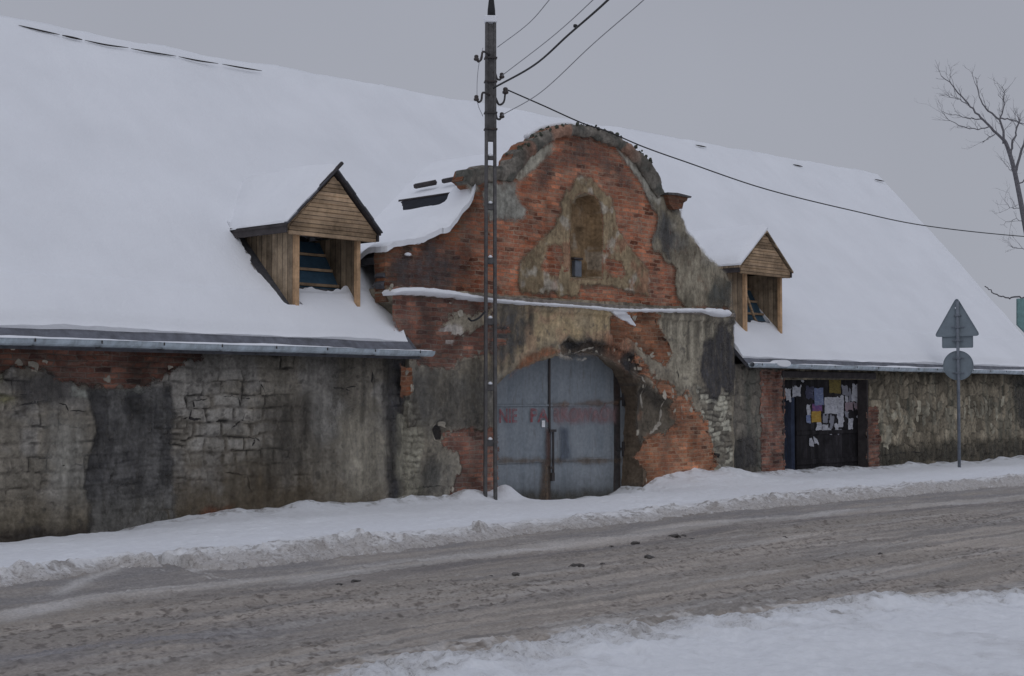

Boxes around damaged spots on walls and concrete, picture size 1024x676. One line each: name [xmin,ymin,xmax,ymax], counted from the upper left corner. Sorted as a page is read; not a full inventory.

flaking render [0,349,204,390]
flaking render [389,284,510,398]
flaking render [559,312,720,488]
water stain [701,320,736,402]
flaking render [432,421,500,495]